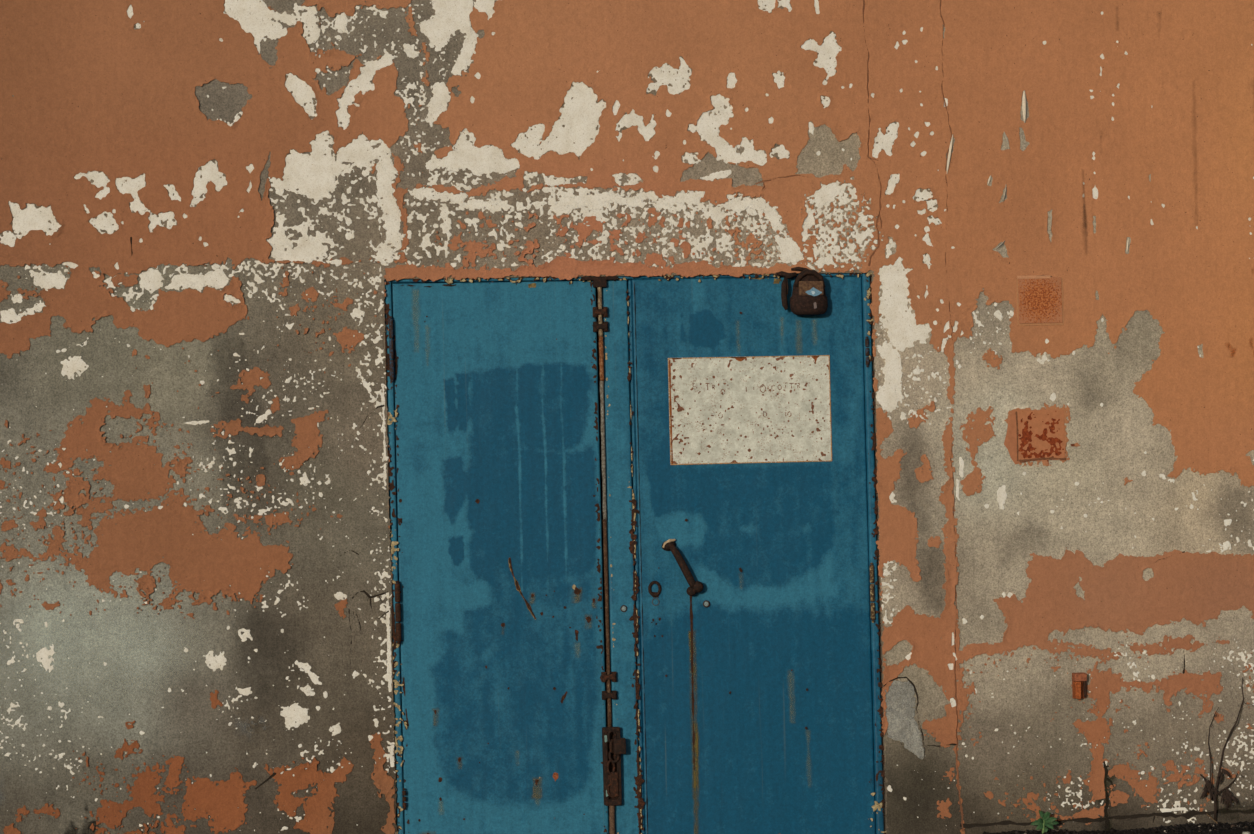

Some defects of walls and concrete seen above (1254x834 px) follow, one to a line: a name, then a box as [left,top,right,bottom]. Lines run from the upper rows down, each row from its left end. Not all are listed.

peeling [872,122,934,158]
peeling [885,174,946,269]
crack [940,0,952,211]
peeling [0,0,897,834]
corrosion [1018,411,1075,462]
corrosion [540,478,604,679]
corrosion [689,596,710,807]
peeling [874,257,1254,834]
crack [883,458,1254,831]